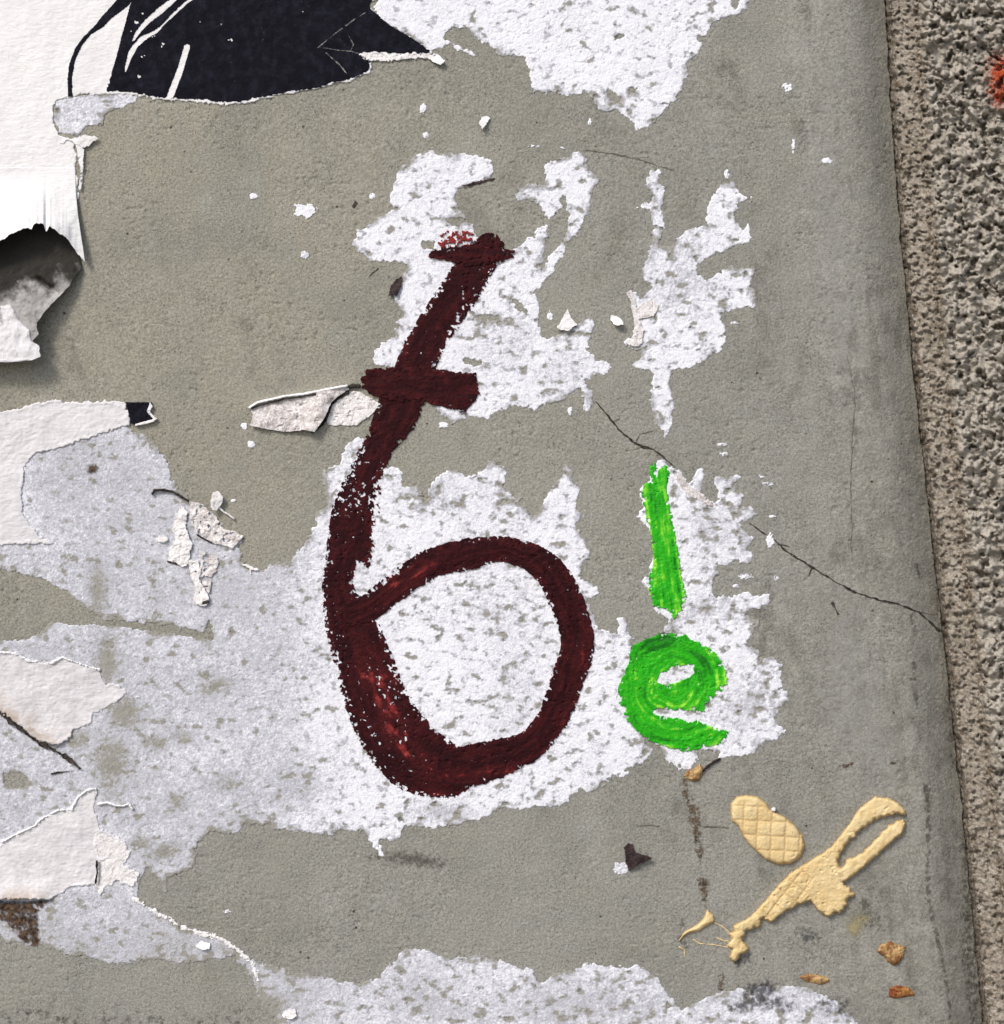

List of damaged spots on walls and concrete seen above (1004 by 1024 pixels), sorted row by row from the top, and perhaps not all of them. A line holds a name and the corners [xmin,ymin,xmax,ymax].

peeling [374,0,749,131]
peeling [352,150,610,425]
peeling [610,169,757,438]
crack [596,402,675,467]
crack [847,357,856,561]
crack [749,523,941,632]
peeling [0,384,858,1024]